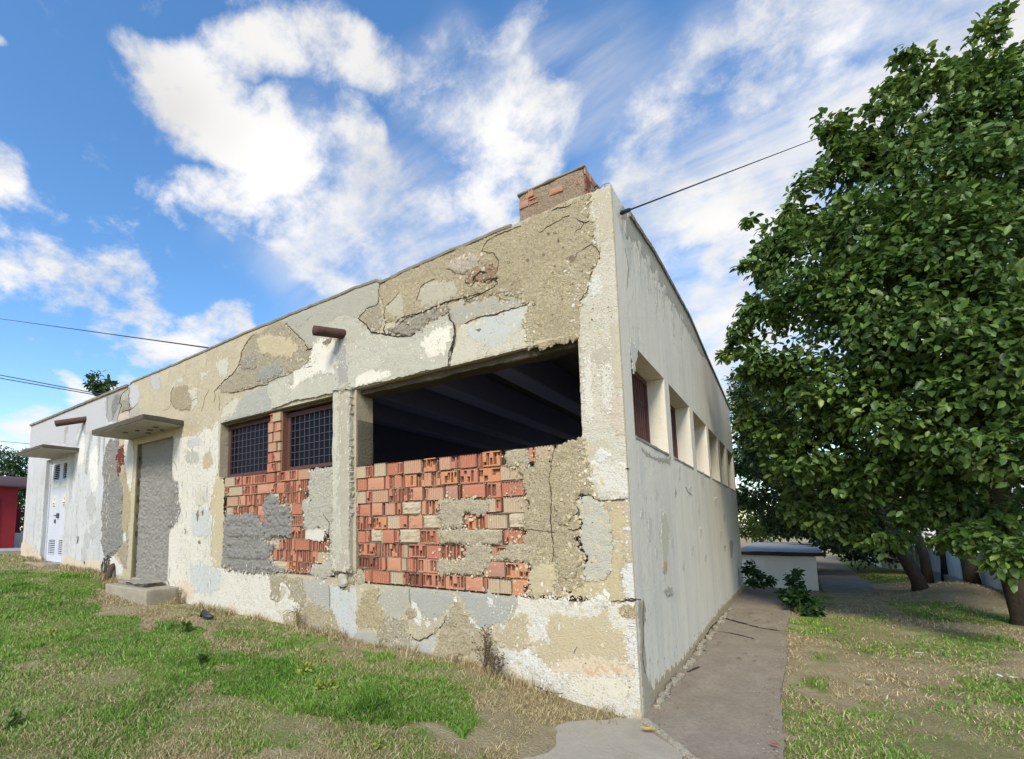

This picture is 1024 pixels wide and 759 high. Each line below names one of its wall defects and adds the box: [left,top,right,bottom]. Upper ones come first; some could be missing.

crack [358,204,600,365]
spalling [76,428,134,576]
spalling [165,167,733,718]
crack [527,447,624,561]